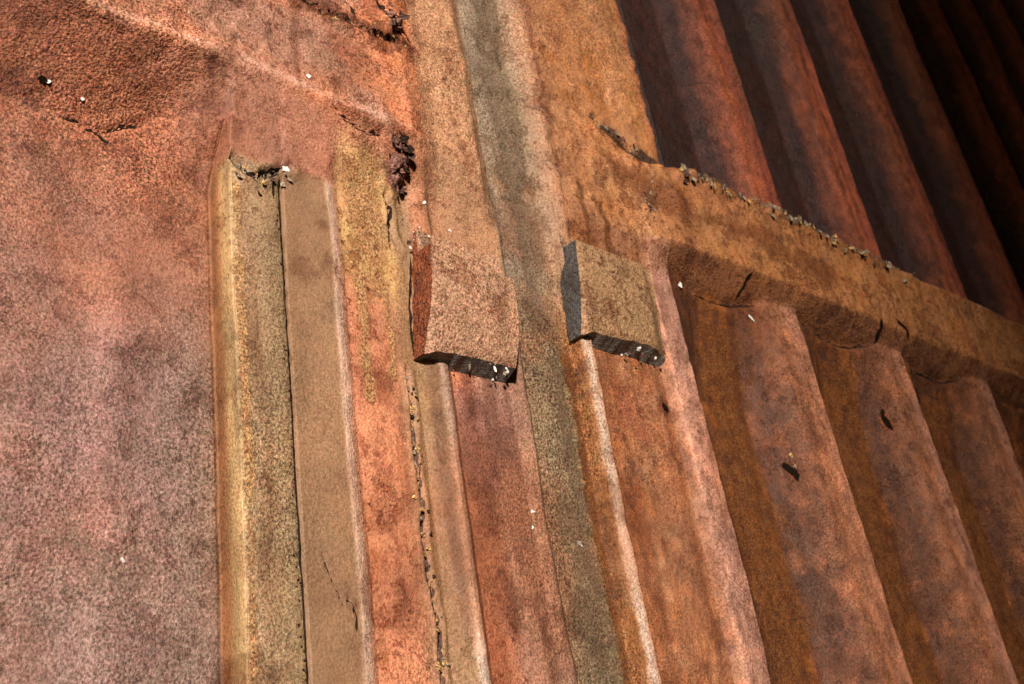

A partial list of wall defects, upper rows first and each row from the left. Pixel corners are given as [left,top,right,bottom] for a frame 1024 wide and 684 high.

crack [60,115,140,143]
crack [321,555,358,633]